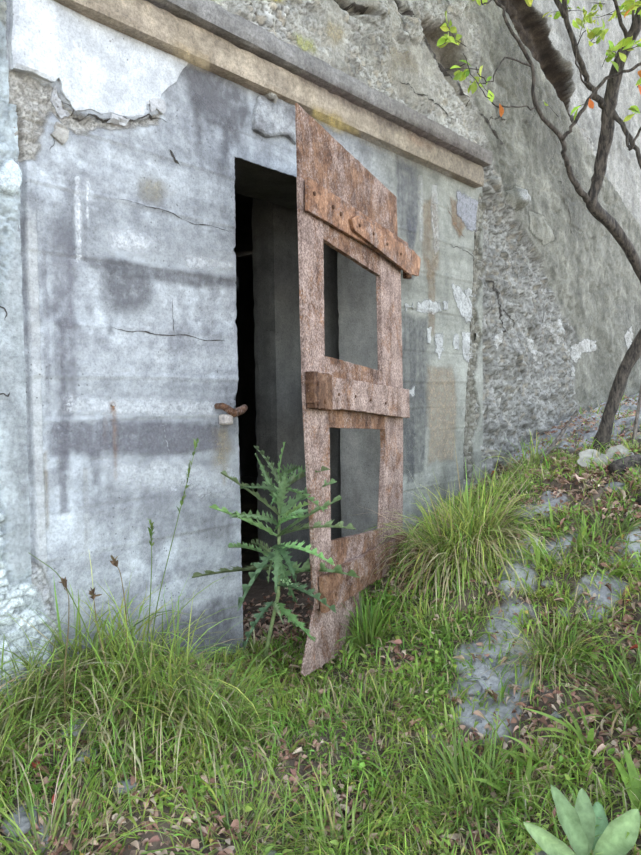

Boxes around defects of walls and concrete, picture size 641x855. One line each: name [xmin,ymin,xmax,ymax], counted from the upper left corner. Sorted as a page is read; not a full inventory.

crack [334,0,368,15]
crack [394,0,415,17]
peeling [8,0,188,162]
crack [400,37,507,150]
crack [113,300,225,341]
spalling [404,191,487,483]
peeling [493,330,504,352]
damp [52,398,235,495]